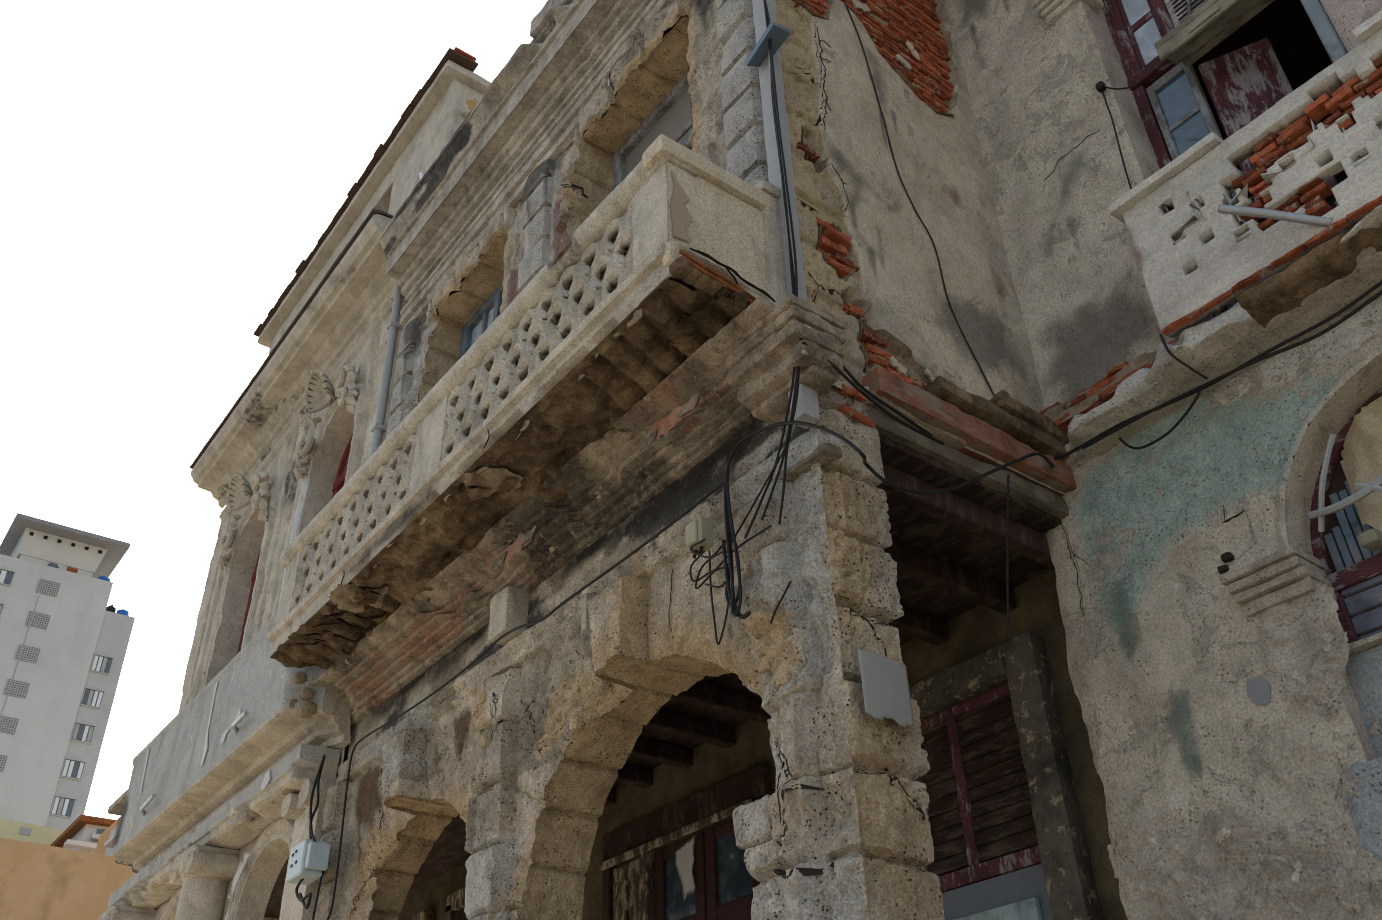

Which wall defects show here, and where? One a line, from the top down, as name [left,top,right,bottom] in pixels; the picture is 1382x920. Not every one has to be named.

flaking render [792,0,958,128]
flaking render [796,127,829,172]
crack [1044,130,1099,181]
flaking render [1232,54,1382,231]
flaking render [815,217,938,429]
flaking render [1039,339,1178,432]
spalling [459,465,524,501]
peeling [490,524,537,569]
crack [1061,524,1088,616]
spalling [277,584,389,719]